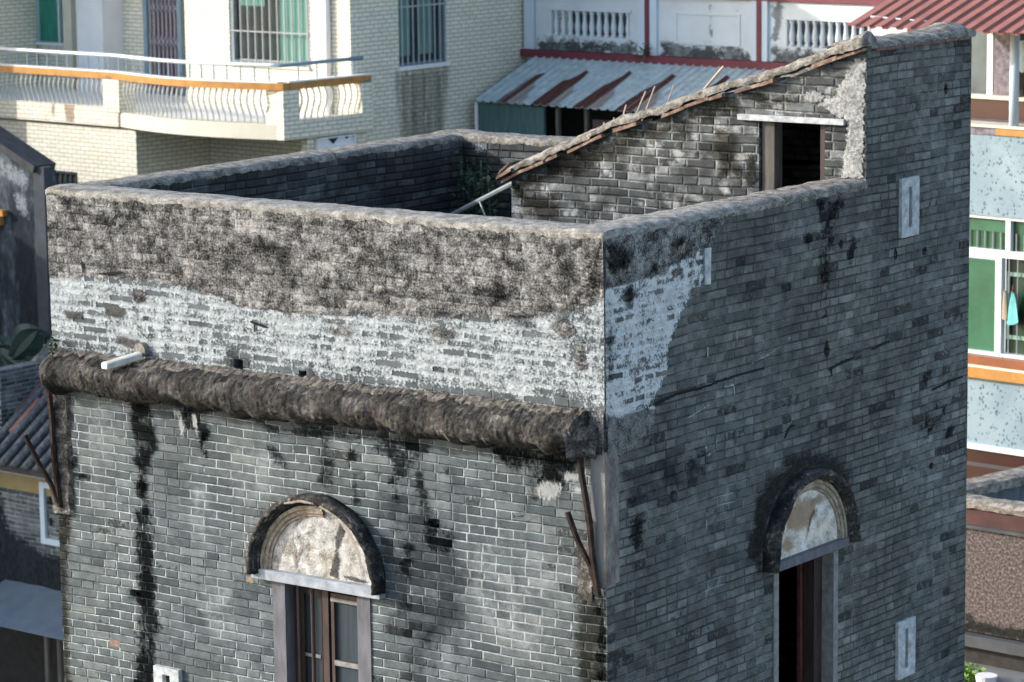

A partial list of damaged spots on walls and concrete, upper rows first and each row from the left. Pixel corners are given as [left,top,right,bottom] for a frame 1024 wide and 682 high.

peeling [845,142,861,168]
damp [805,192,844,318]
flaking render [46,192,739,458]
crack [647,367,764,409]
damp [174,406,210,458]
damp [254,418,454,552]
damp [492,447,577,499]
damp [129,403,161,682]
damp [399,544,414,577]